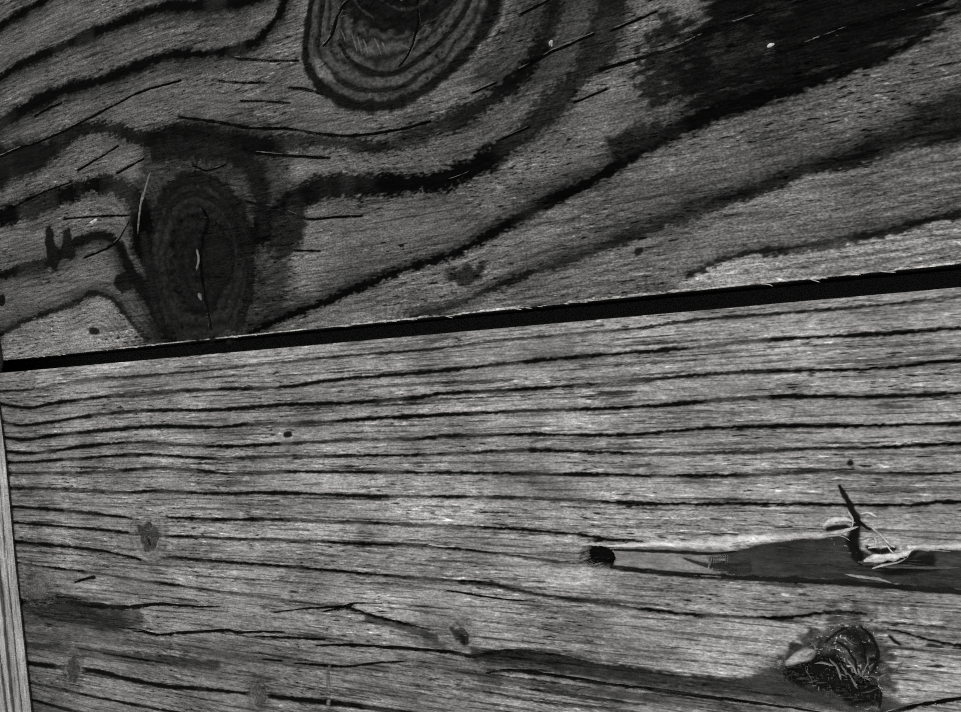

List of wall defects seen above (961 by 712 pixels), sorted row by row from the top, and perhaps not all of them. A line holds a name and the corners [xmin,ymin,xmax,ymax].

damp [606,0,961,159]
crack [21,575,823,712]
crack [886,696,961,712]